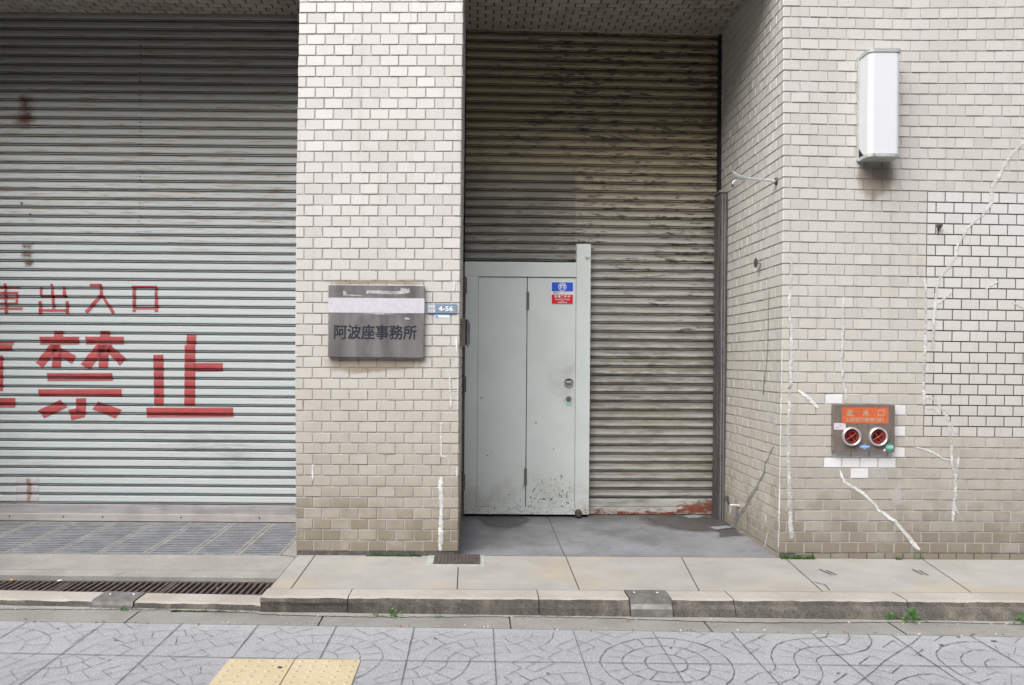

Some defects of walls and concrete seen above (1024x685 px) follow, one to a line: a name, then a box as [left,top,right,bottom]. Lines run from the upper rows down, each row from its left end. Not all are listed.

crack [436,337,459,551]
crack [734,255,819,548]
crack [840,297,848,403]
crack [839,470,920,550]
crack [916,142,1024,523]